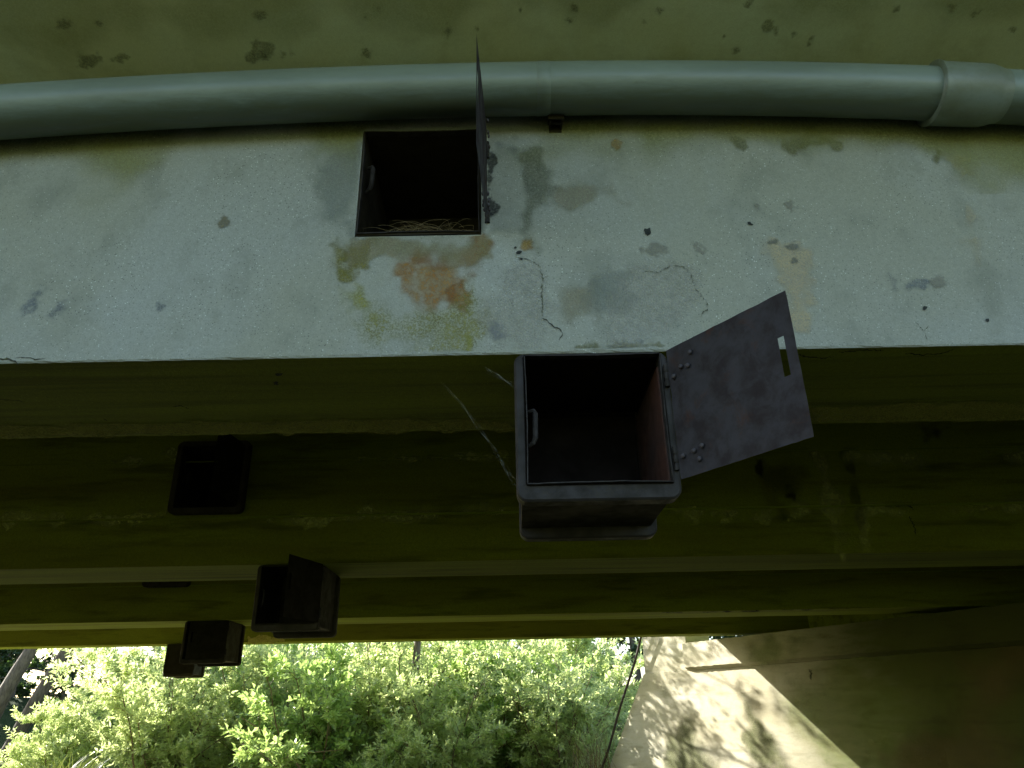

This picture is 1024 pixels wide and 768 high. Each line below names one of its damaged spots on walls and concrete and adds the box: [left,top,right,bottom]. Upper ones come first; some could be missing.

rust [395,255,471,310]
crack [517,257,563,338]